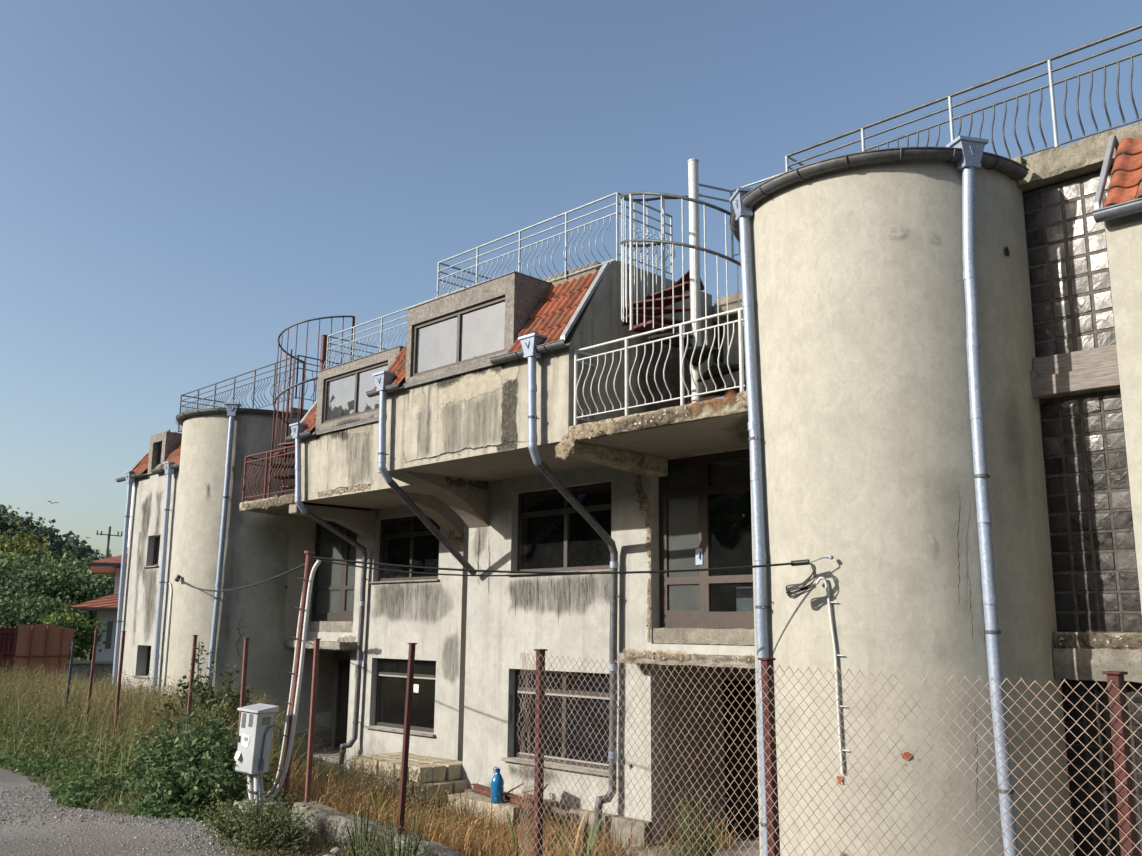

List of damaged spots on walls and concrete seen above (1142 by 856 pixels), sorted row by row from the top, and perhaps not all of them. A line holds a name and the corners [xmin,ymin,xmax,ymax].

water stain [416,363,518,451]
spalling [555,406,689,459]
water stain [377,583,437,620]
water stain [513,576,610,612]